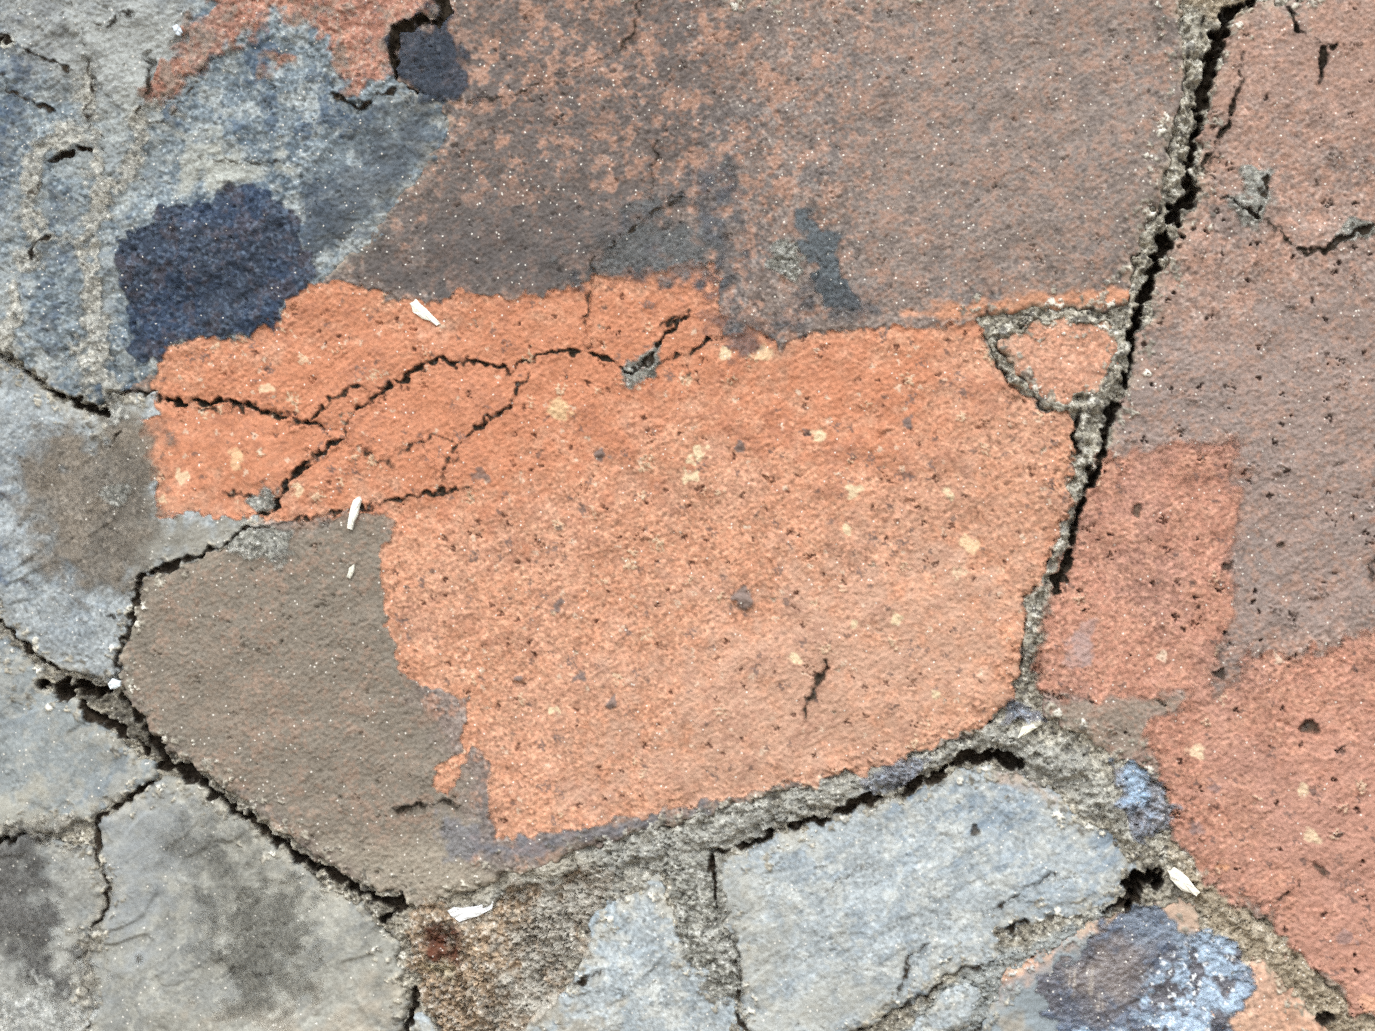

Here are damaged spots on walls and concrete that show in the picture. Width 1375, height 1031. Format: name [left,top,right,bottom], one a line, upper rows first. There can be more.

crack [0,140,723,955]
crack [1050,0,1375,595]
crack [404,986,420,1031]